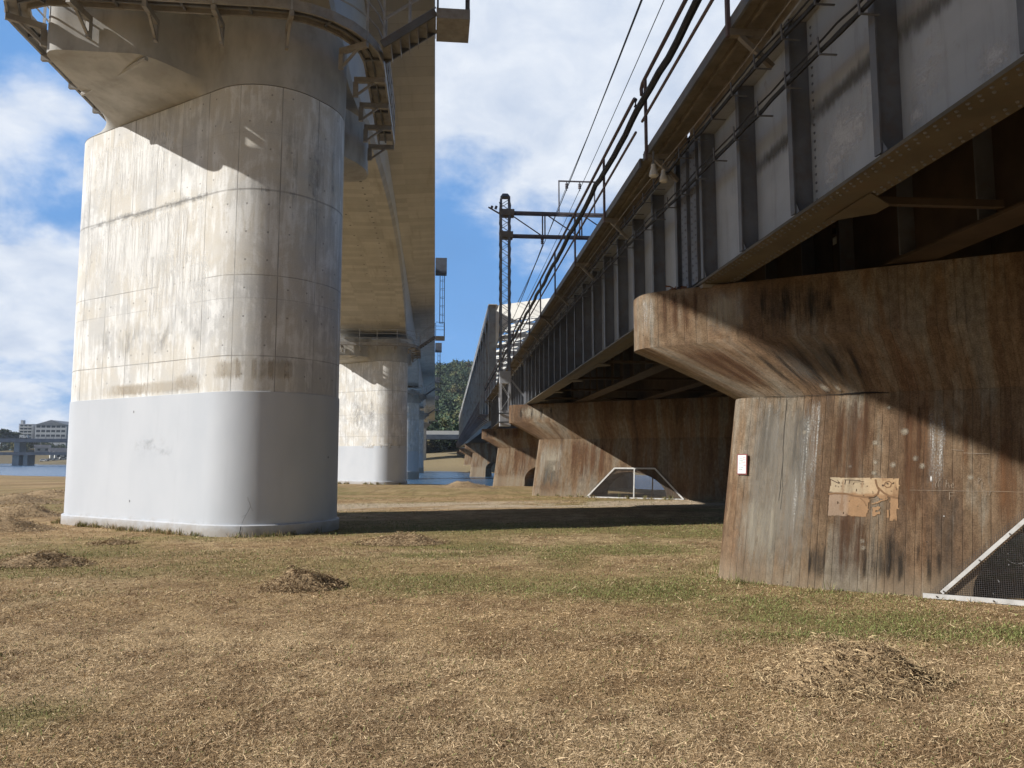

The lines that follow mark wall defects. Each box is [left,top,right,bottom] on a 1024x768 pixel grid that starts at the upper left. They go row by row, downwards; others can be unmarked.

leakage [863,545,902,576]